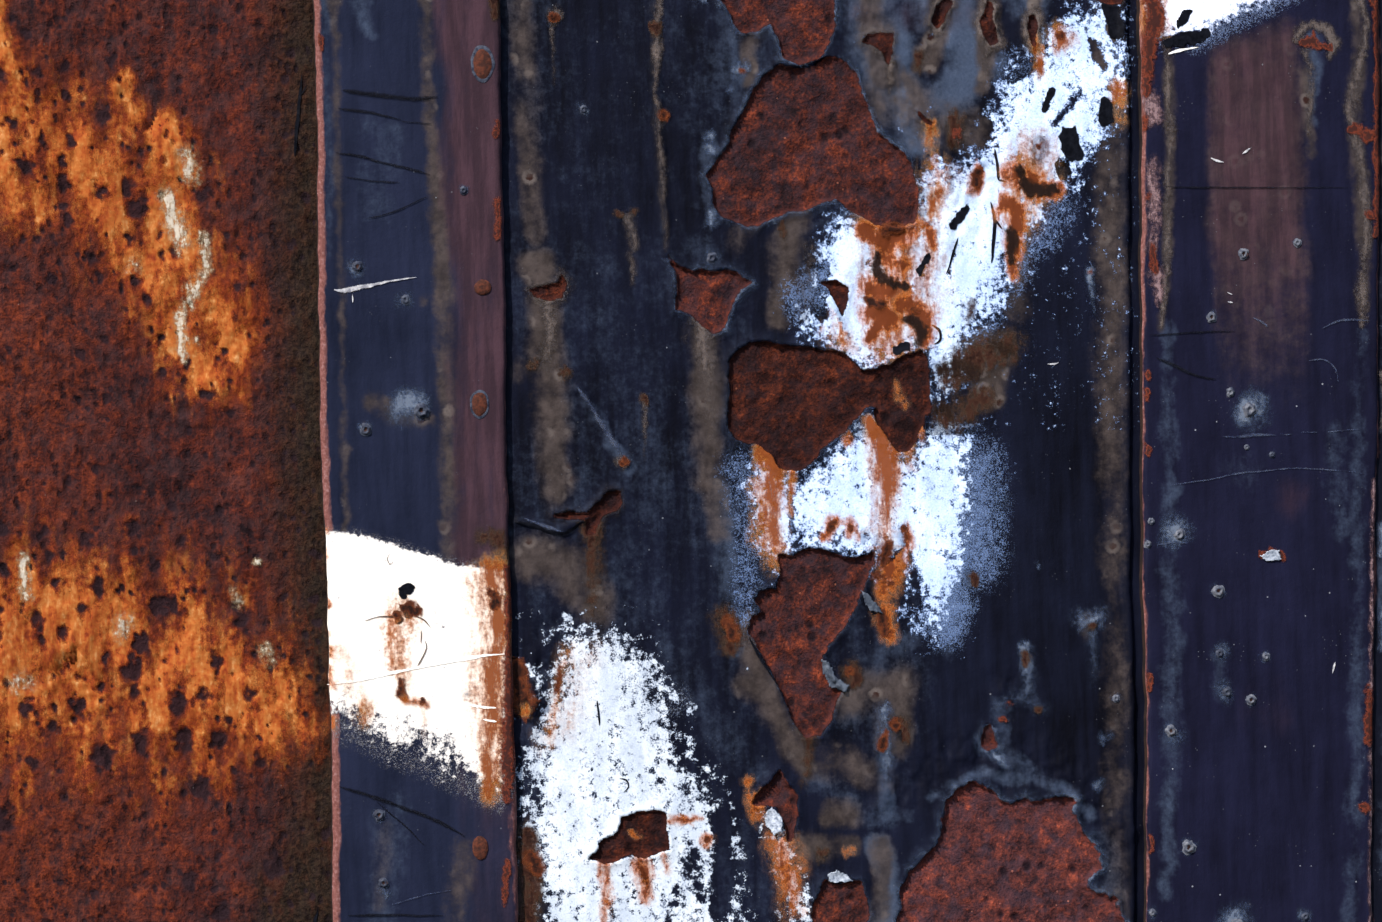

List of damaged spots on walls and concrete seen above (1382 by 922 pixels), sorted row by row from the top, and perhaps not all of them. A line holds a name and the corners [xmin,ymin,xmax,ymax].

rust [0,0,251,400]
peeling [705,0,920,239]
rust [839,172,948,357]
peeling [918,111,936,170]
rust [966,134,1065,281]
rust [0,545,335,816]
rust [387,598,429,709]
rust [466,528,562,803]
peeling [669,258,933,922]
rust [820,516,914,643]
peeling [590,810,669,922]
peeling [896,780,1125,922]